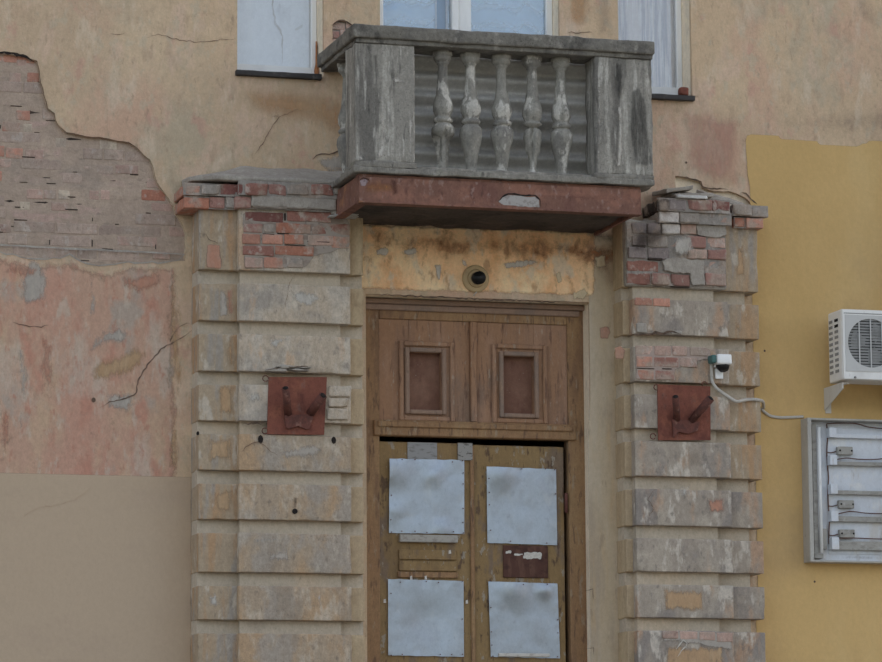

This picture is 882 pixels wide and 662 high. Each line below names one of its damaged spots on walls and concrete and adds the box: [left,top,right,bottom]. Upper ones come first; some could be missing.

spalling [332,20,352,41]
peeling [0,51,185,477]
spalling [242,211,350,269]
spalling [622,219,727,307]
crack [100,323,187,408]